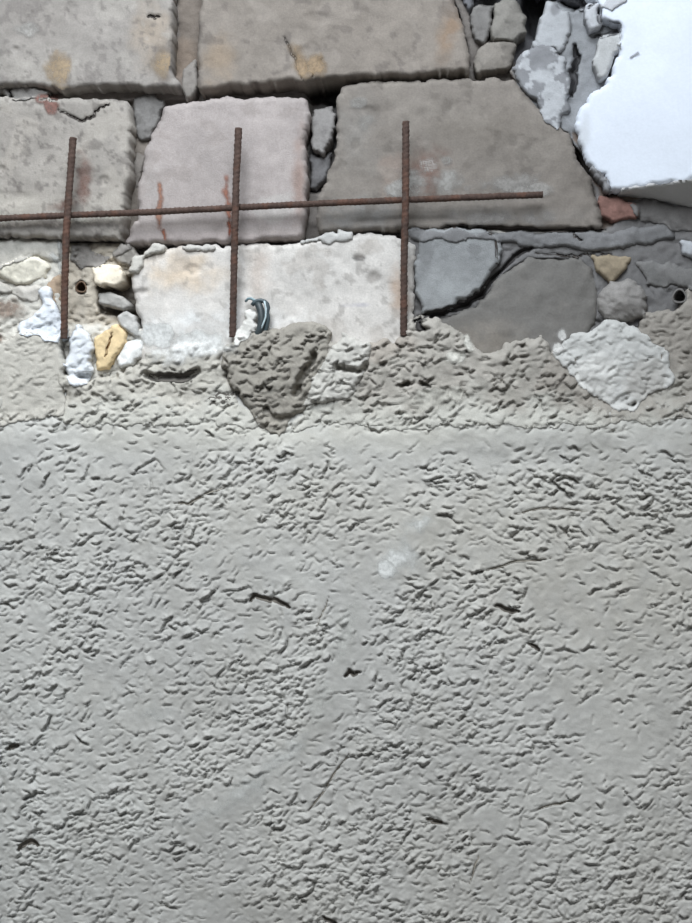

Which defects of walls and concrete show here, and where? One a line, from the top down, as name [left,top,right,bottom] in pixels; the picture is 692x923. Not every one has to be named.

peeling [583,0,627,83]
crack [48,94,109,122]
peeling [588,166,612,197]
corrosion [156,183,166,239]
spalling [0,121,543,339]